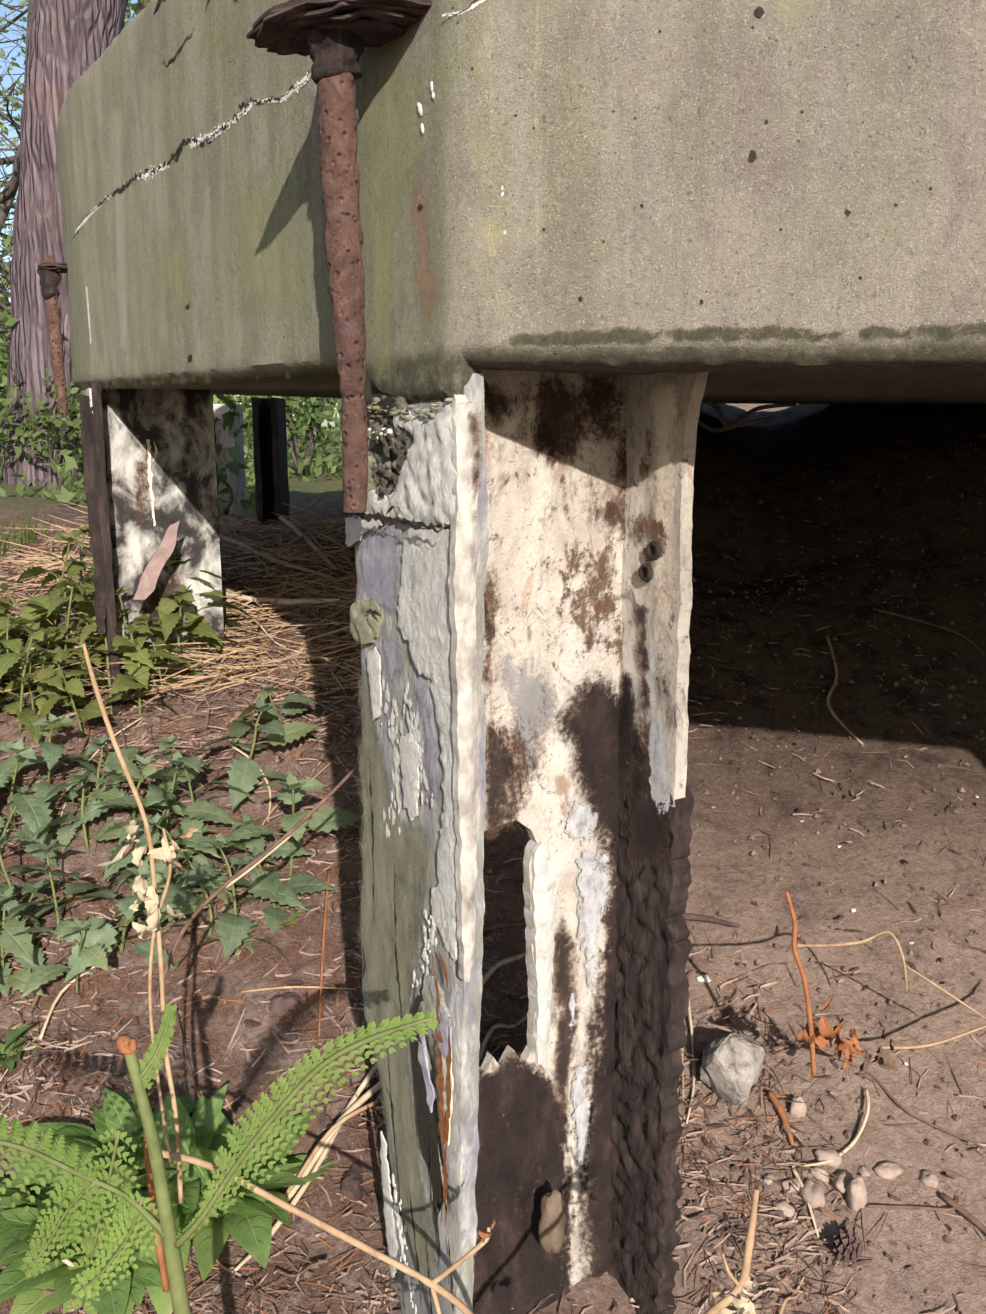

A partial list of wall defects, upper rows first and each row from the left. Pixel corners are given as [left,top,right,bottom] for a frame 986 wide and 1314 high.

crack [441,0,486,17]
crack [71,71,311,241]
peeling [345,517,383,547]
peeling [366,523,458,1145]